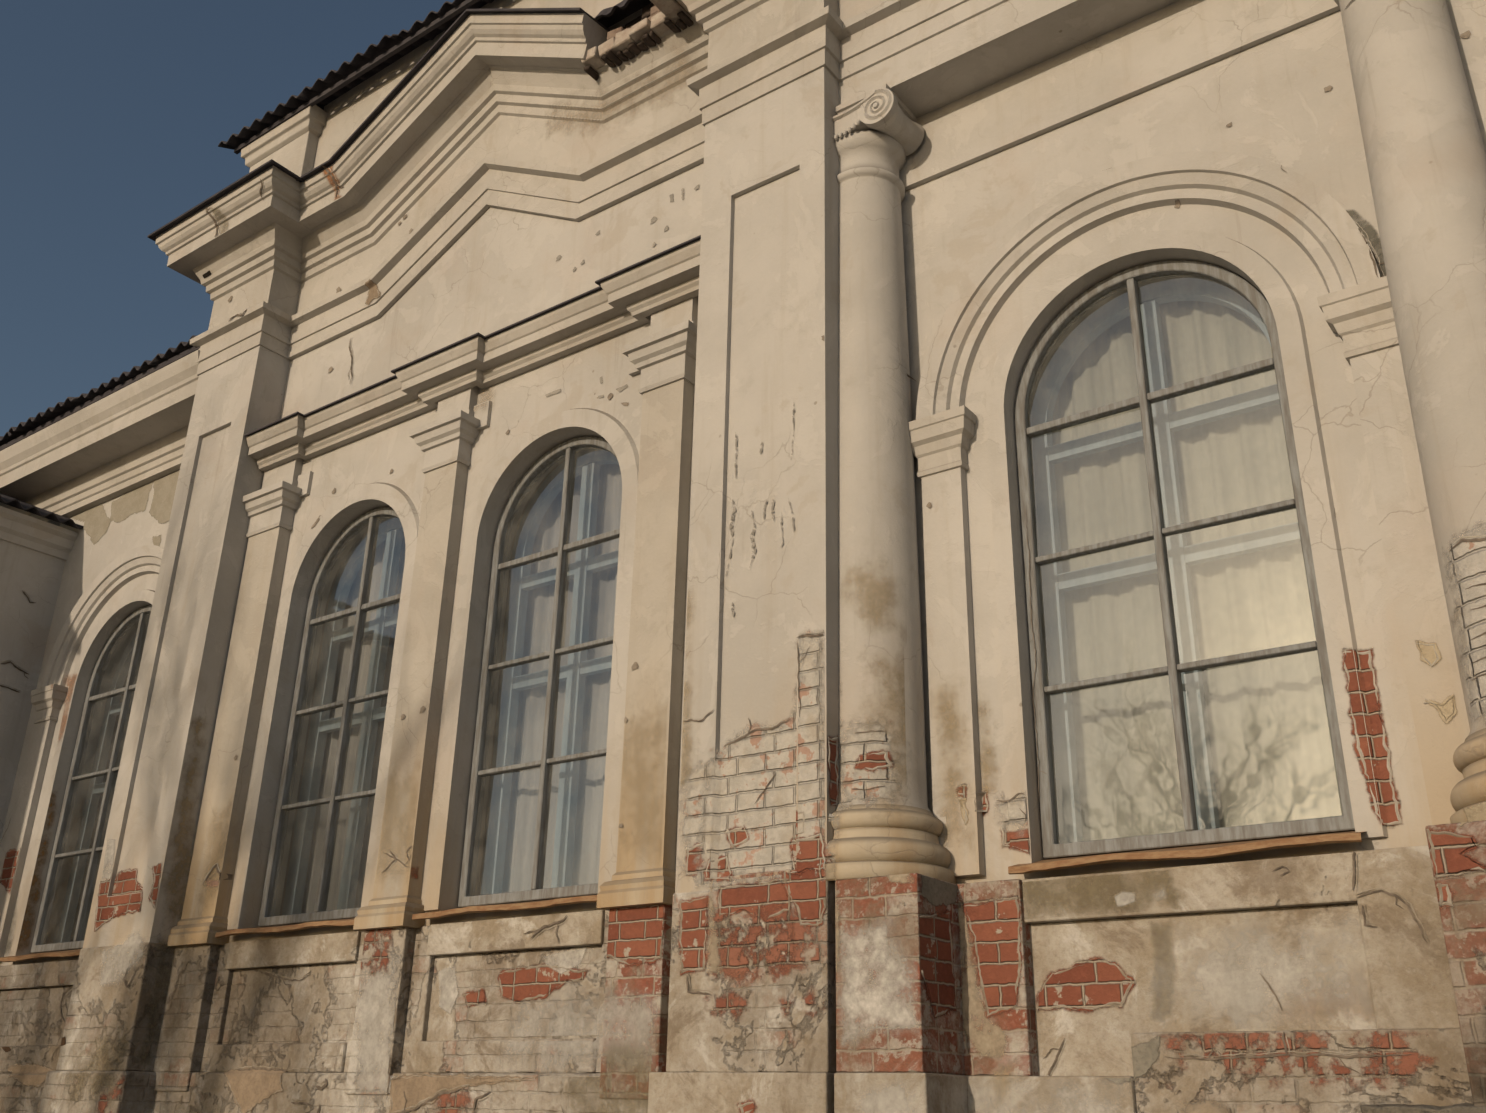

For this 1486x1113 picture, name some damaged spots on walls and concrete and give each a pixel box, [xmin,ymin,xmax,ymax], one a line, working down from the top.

flaking render [1424,529,1486,724]
flaking render [1343,648,1402,827]
flaking render [0,848,21,894]
damp [5,794,54,952]
flaking render [94,839,161,931]
flaking render [607,631,900,1016]
flaking render [1426,828,1486,909]
flaking render [438,947,587,1013]
flaking render [919,896,1022,1018]
flaking render [1036,957,1135,1013]
flaking render [1043,1038,1066,1076]
flaking render [1165,1031,1433,1087]